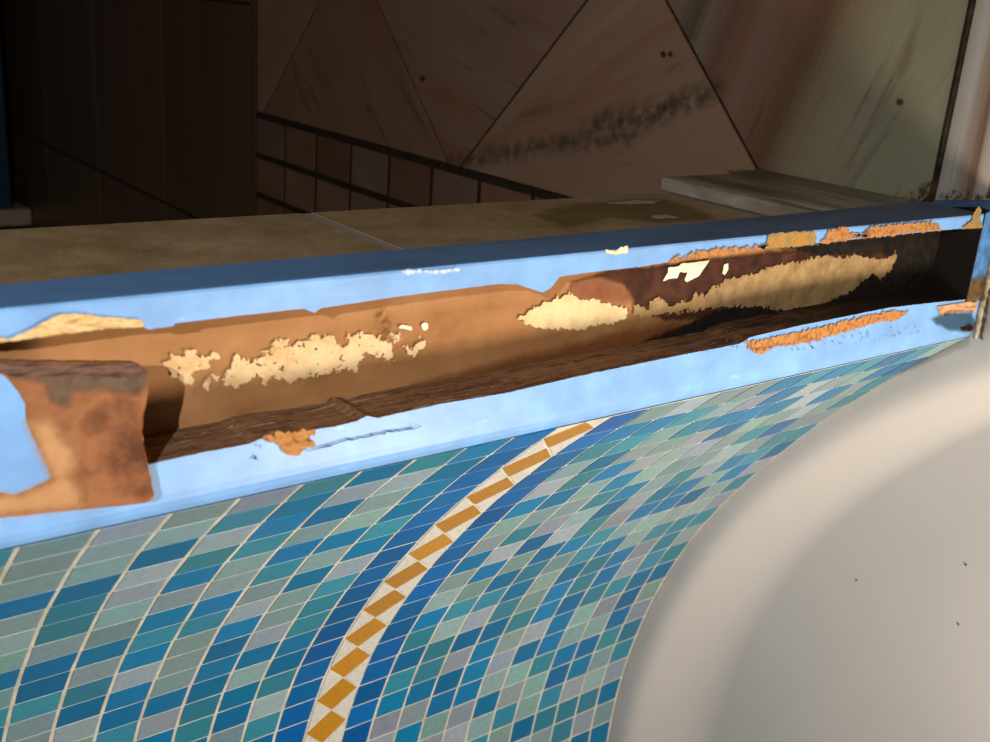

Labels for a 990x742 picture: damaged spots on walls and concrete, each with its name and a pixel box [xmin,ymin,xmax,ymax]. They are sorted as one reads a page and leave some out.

peeling [963,206,983,229]
peeling [606,246,628,255]
peeling [670,221,941,275]
peeling [938,302,978,316]
peeling [389,322,428,358]
peeling [744,310,908,355]
peeling [0,371,153,517]
peeling [263,428,316,456]